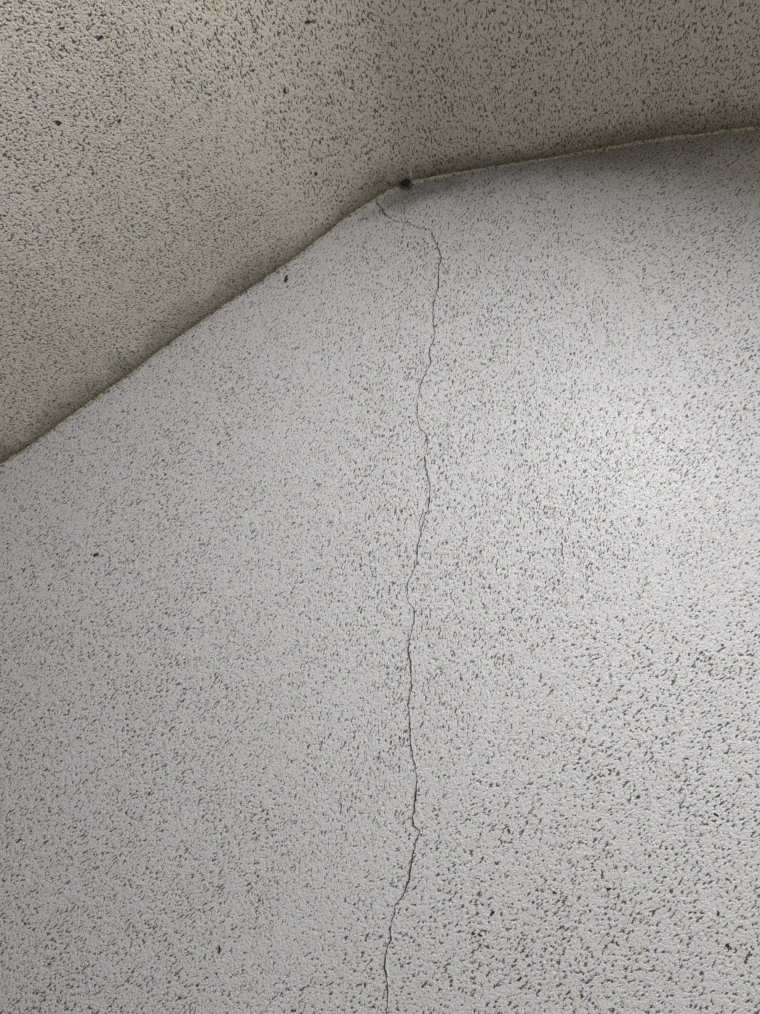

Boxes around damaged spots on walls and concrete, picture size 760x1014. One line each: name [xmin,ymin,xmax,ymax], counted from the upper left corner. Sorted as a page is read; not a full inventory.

crack [375,201,450,1014]